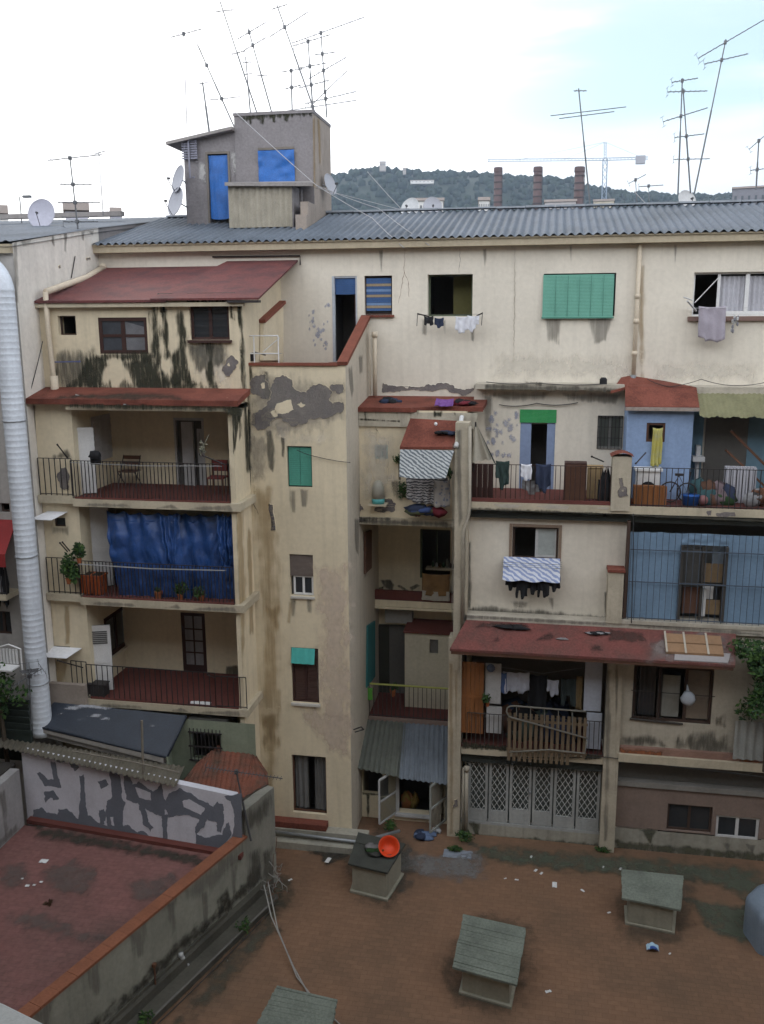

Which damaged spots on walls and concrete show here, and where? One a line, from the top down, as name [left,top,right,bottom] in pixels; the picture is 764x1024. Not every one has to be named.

peeling [222,355,239,377]
damp [56,300,252,485]
peeling [250,373,345,431]
peeling [382,382,474,396]
damp [267,431,284,470]
damp [625,737,663,746]
damp [677,722,726,752]
peeling [37,759,79,802]
peeling [224,793,242,838]
damp [36,825,202,865]
damp [94,851,273,1024]